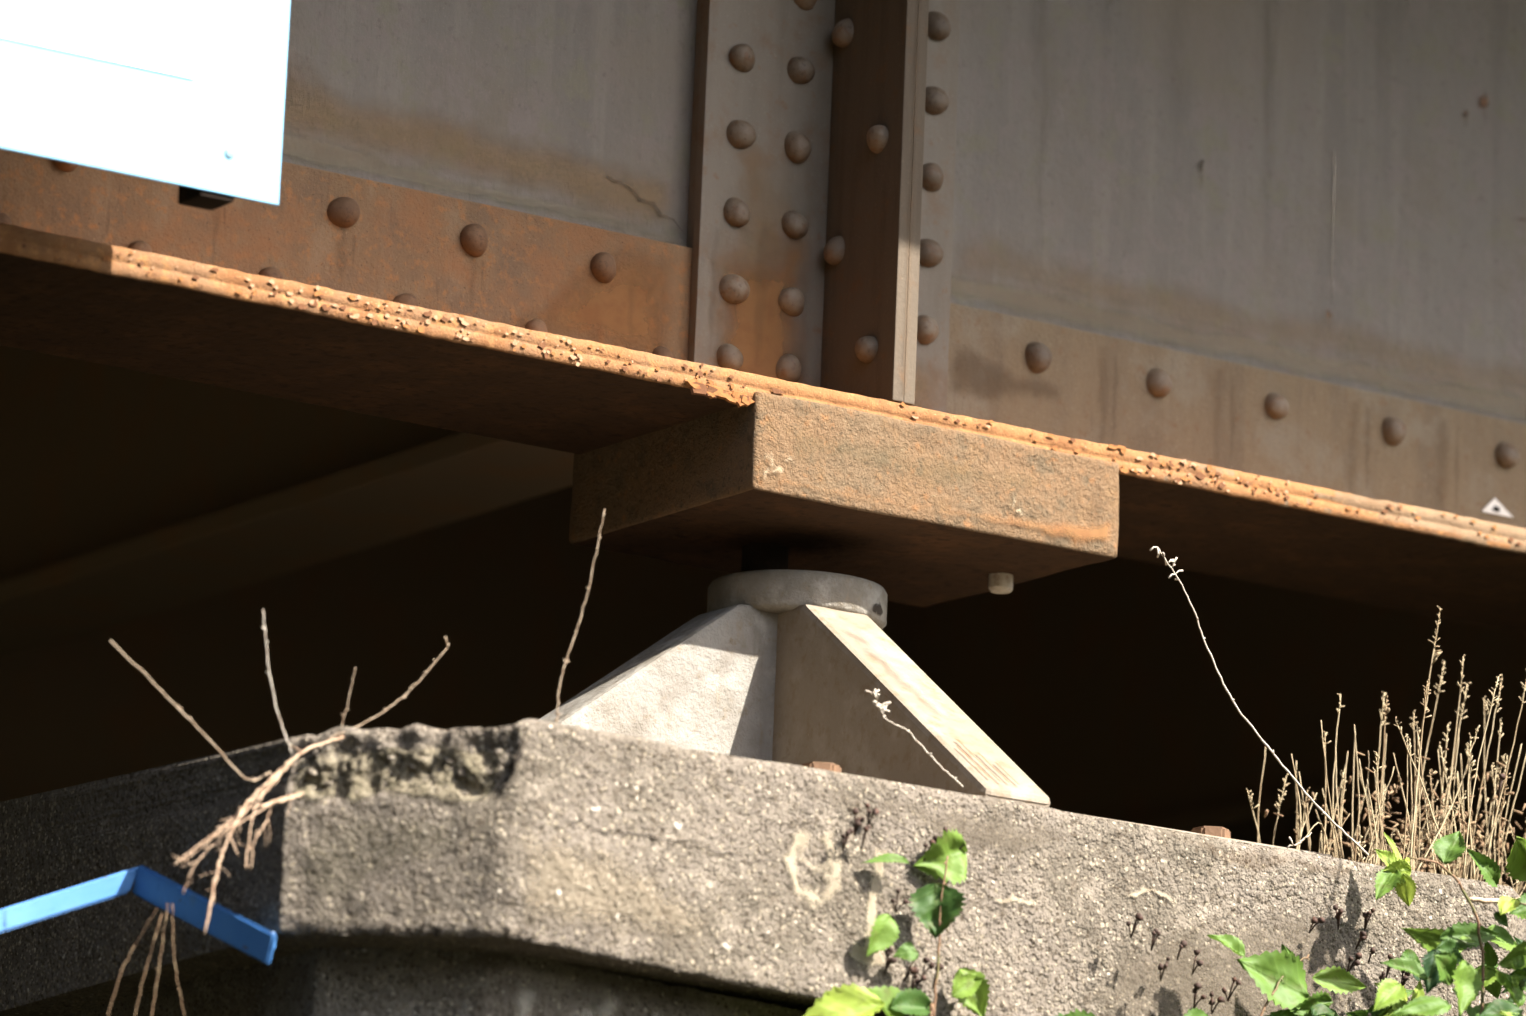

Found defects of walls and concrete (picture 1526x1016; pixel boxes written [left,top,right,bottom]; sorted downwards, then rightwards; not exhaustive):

crack [607,177,678,226]
corrosion [236,277,487,341]
corrosion [505,249,800,408]
corrosion [1108,444,1360,514]
corrosion [1012,521,1109,539]